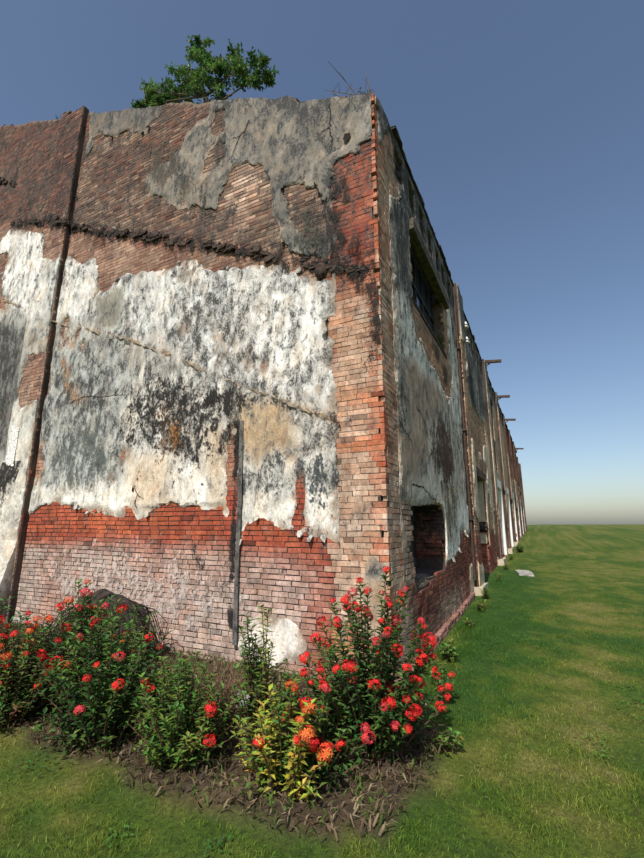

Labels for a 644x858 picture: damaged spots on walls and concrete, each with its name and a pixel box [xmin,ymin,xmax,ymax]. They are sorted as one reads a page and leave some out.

damp [125,133,208,217]
damp [116,360,234,488]
flaking render [0,93,527,681]
damp [450,302,484,416]
damp [407,406,470,647]